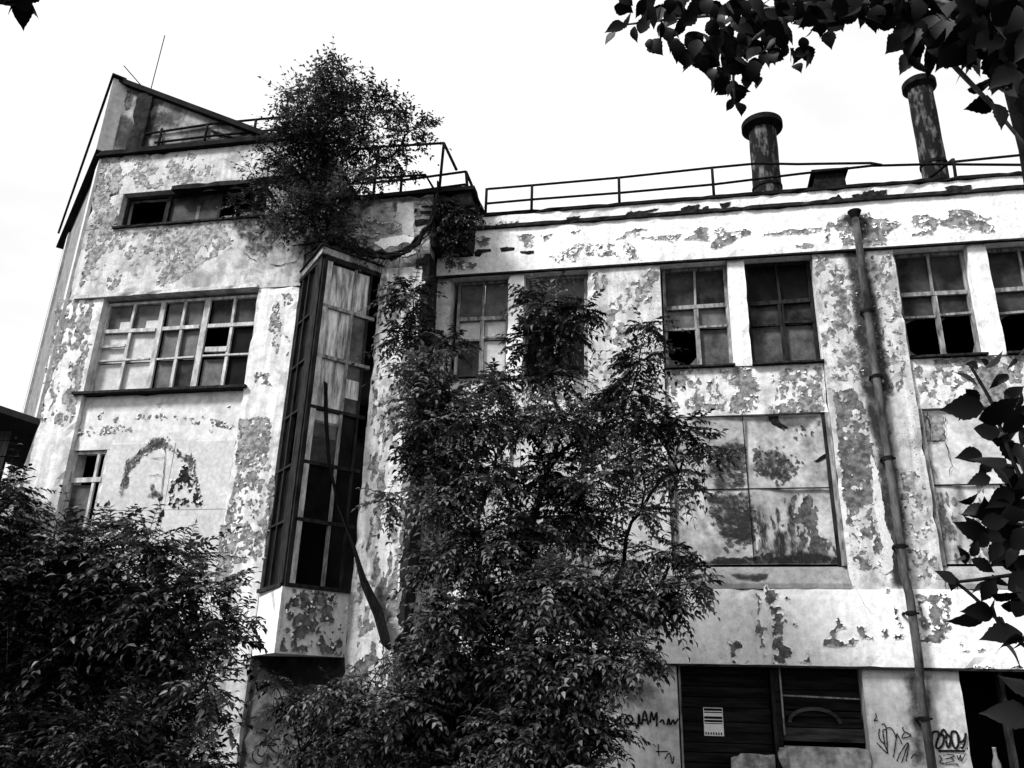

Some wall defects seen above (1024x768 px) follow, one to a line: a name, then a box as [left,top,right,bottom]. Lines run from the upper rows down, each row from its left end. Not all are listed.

peeling [79,151,234,291]
peeling [268,292,293,356]
peeling [462,208,1024,581]
peeling [40,298,275,603]
peeling [280,276,416,758]
peeling [727,626,750,664]
peeling [754,585,812,665]
peeling [822,605,904,648]
peeling [915,593,996,669]